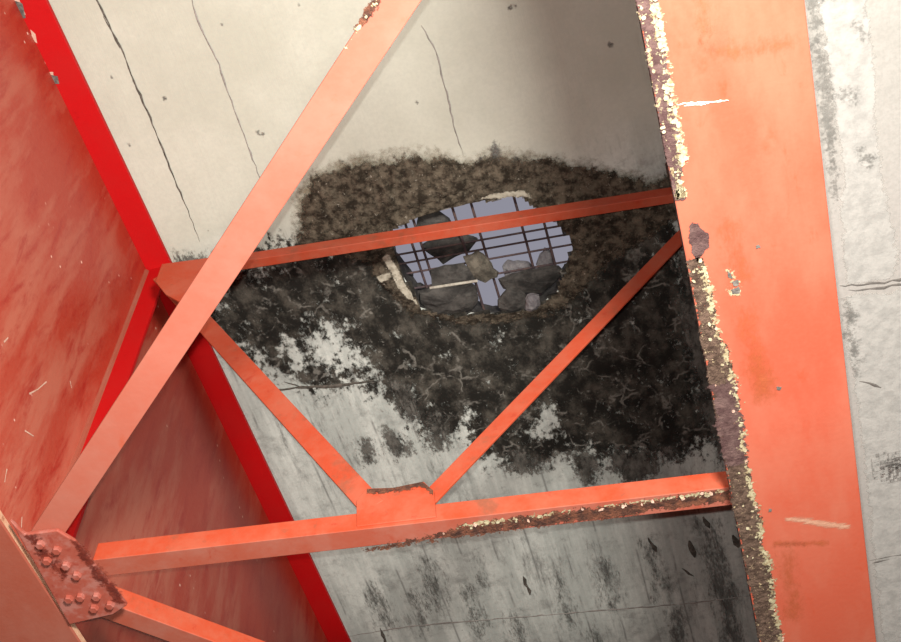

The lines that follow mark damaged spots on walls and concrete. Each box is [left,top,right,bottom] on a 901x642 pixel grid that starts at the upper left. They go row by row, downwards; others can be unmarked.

crack [96,0,200,242]
crack [192,0,260,177]
rust [345,0,381,49]
crack [422,27,463,153]
spalling [294,0,690,325]
rust [25,535,68,581]
rust [71,539,125,604]
water stain [211,219,677,465]
rust [361,489,731,552]
water stain [480,246,724,487]
peeling [686,222,785,642]
crack [840,278,901,291]